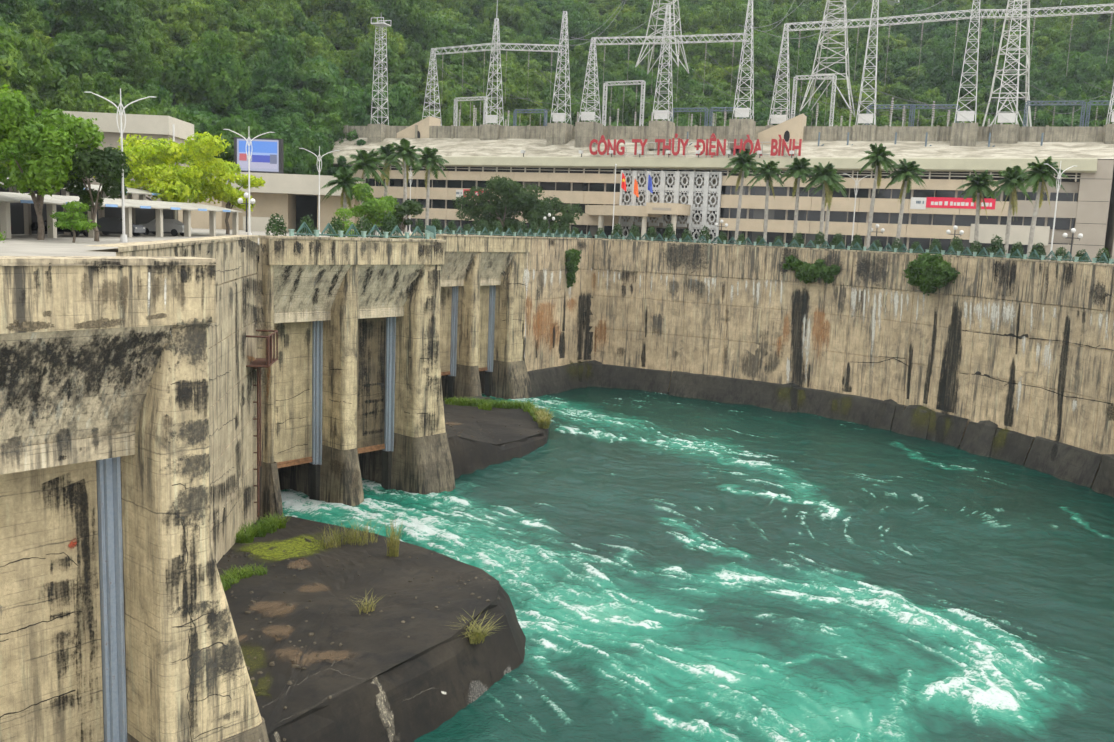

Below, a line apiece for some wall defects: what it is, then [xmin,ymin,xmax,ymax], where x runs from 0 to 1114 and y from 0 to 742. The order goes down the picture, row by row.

leakage [523,243,716,382]
leakage [731,247,811,410]
leakage [822,252,1114,461]
leakage [0,239,450,736]
crack [0,612,74,642]
crack [1,552,78,567]
crack [0,690,76,718]